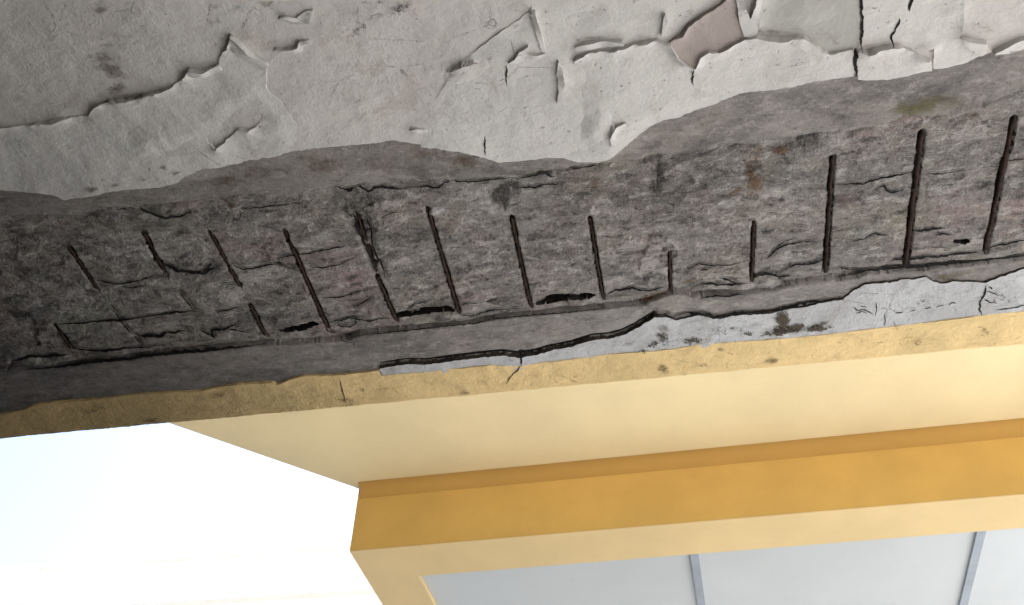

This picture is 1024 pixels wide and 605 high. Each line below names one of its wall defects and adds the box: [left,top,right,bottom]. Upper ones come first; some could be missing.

rust [284,231,329,328]
rust [357,213,398,321]
rust [426,206,460,314]
spalling [0,0,1024,375]
crack [12,164,1024,383]
rust [510,215,532,307]
rust [588,215,605,299]
leakage [641,326,668,354]
leakage [683,305,832,345]
rust [822,155,835,273]
rust [902,129,925,265]
rust [983,115,1016,253]